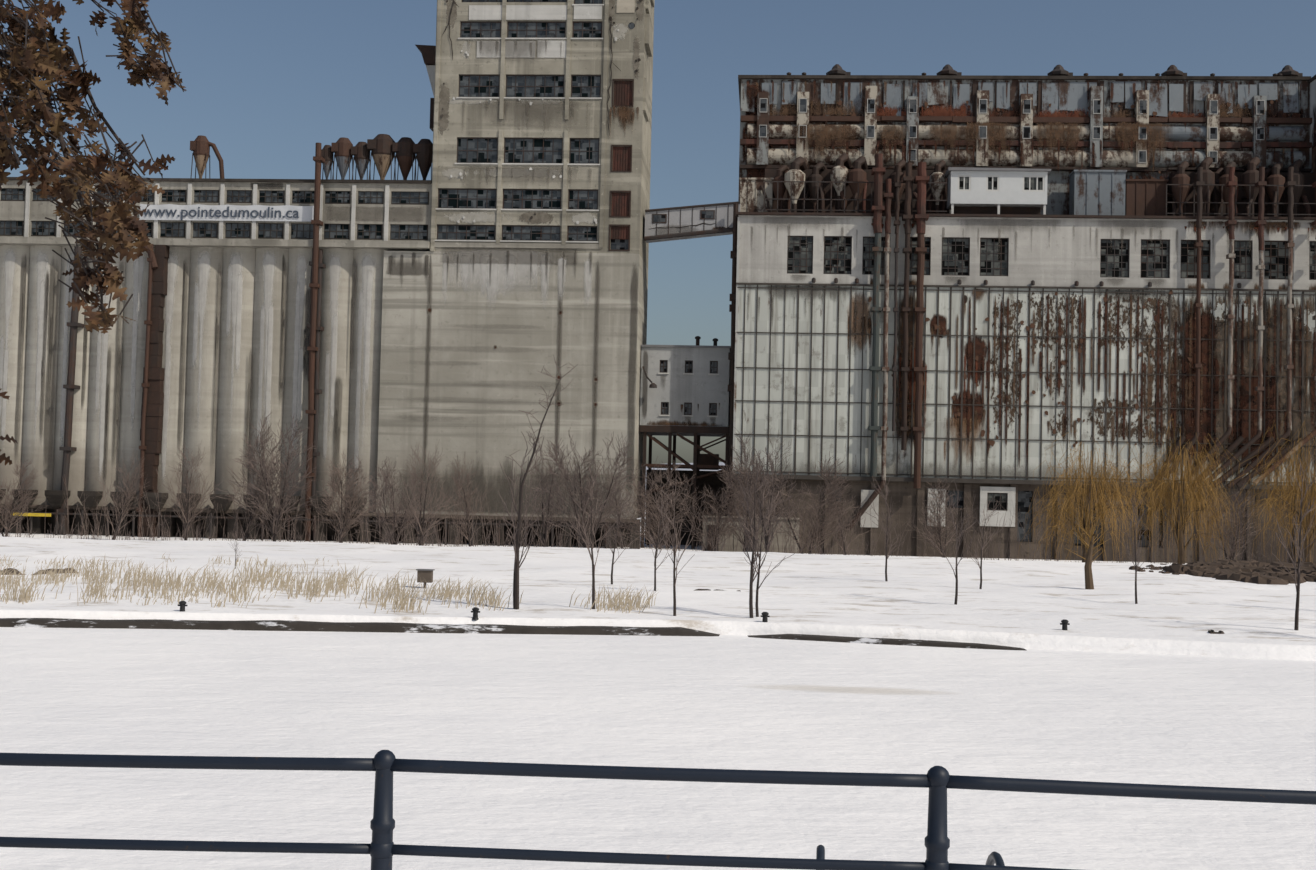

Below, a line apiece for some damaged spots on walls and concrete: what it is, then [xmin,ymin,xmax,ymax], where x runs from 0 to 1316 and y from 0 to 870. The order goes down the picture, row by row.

corrosion [743,80,1136,178]
corrosion [1220,81,1252,118]
corrosion [1266,83,1316,164]
leakage [0,251,144,479]
leakage [162,253,310,475]
leakage [323,250,592,491]
corrosion [848,279,873,351]
corrosion [891,280,1316,492]